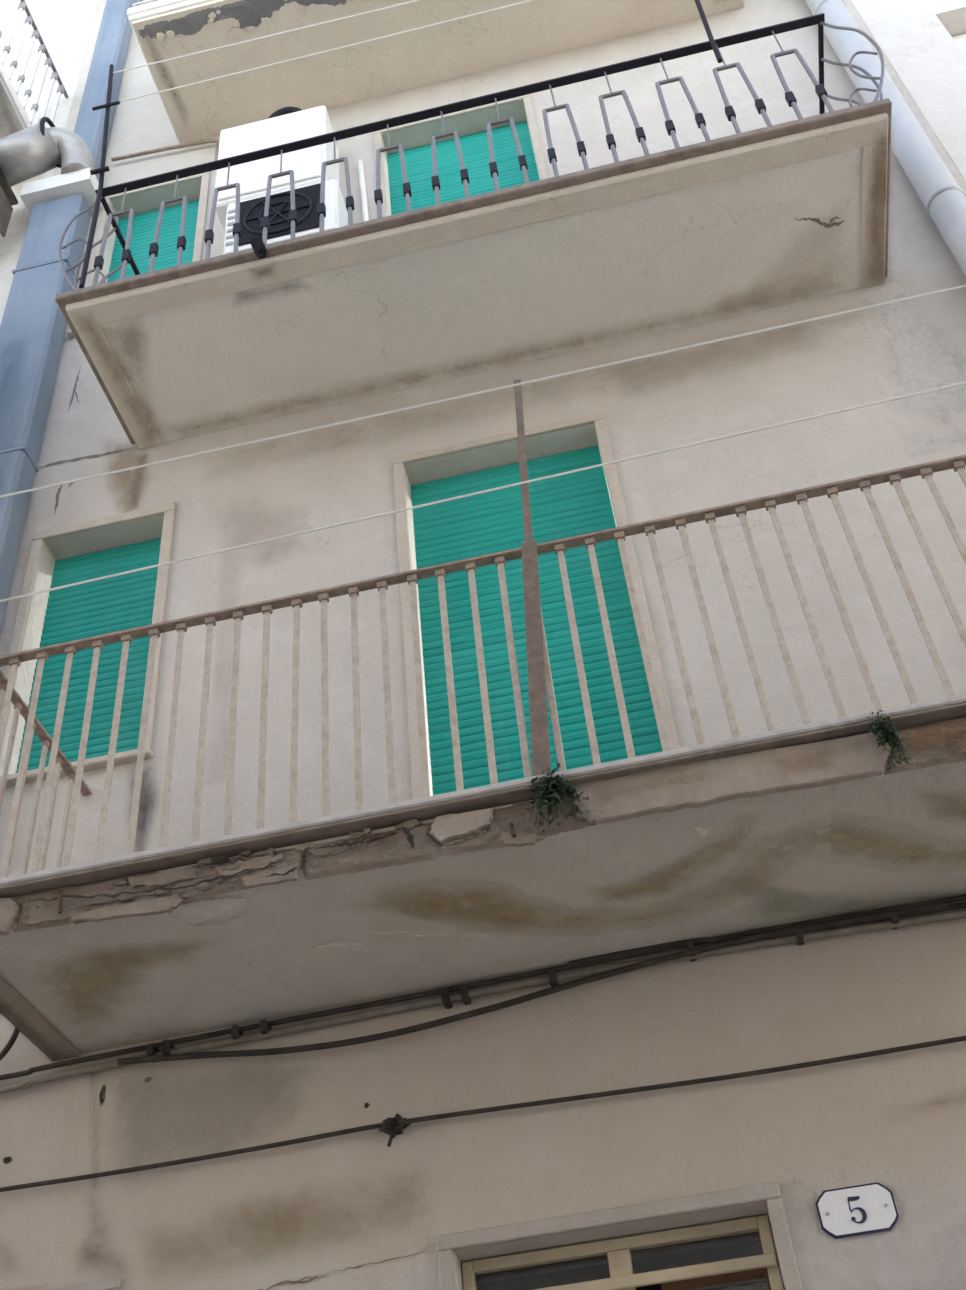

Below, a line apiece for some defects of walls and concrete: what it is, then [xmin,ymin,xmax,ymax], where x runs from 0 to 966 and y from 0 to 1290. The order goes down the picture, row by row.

peeling [138,0,356,44]
crack [795,216,844,228]
spalling [884,717,966,775]
spalling [12,793,596,932]
crack [258,1250,427,1290]